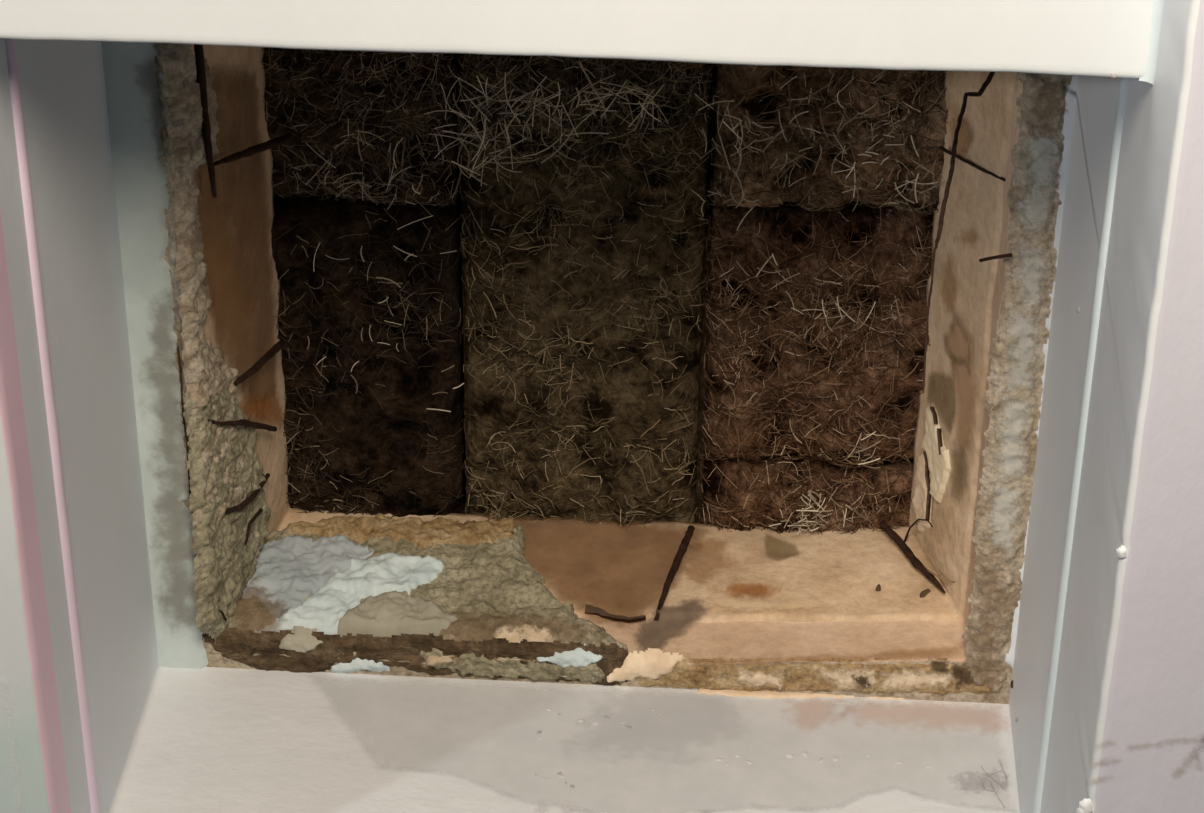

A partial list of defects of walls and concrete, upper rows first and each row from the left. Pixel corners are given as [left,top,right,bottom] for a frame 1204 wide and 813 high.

spalling [156,43,1066,700]